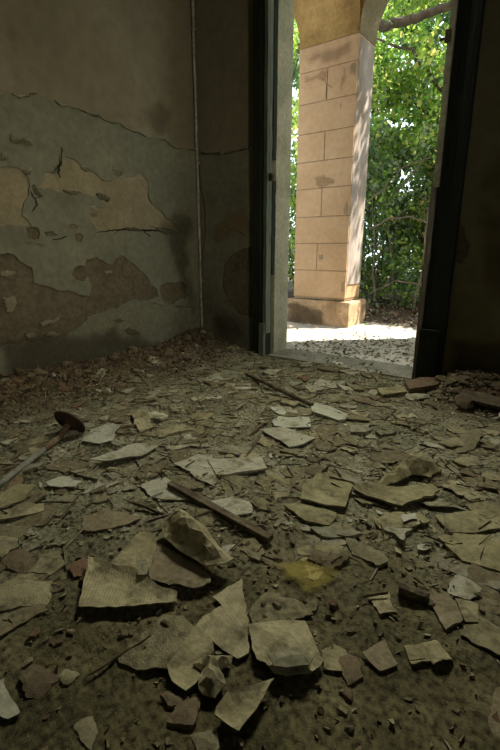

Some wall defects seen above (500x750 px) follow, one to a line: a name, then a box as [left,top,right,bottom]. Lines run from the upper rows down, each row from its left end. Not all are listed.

crack [53,147,63,178]
peeling [0,91,253,374]
crack [97,228,178,236]